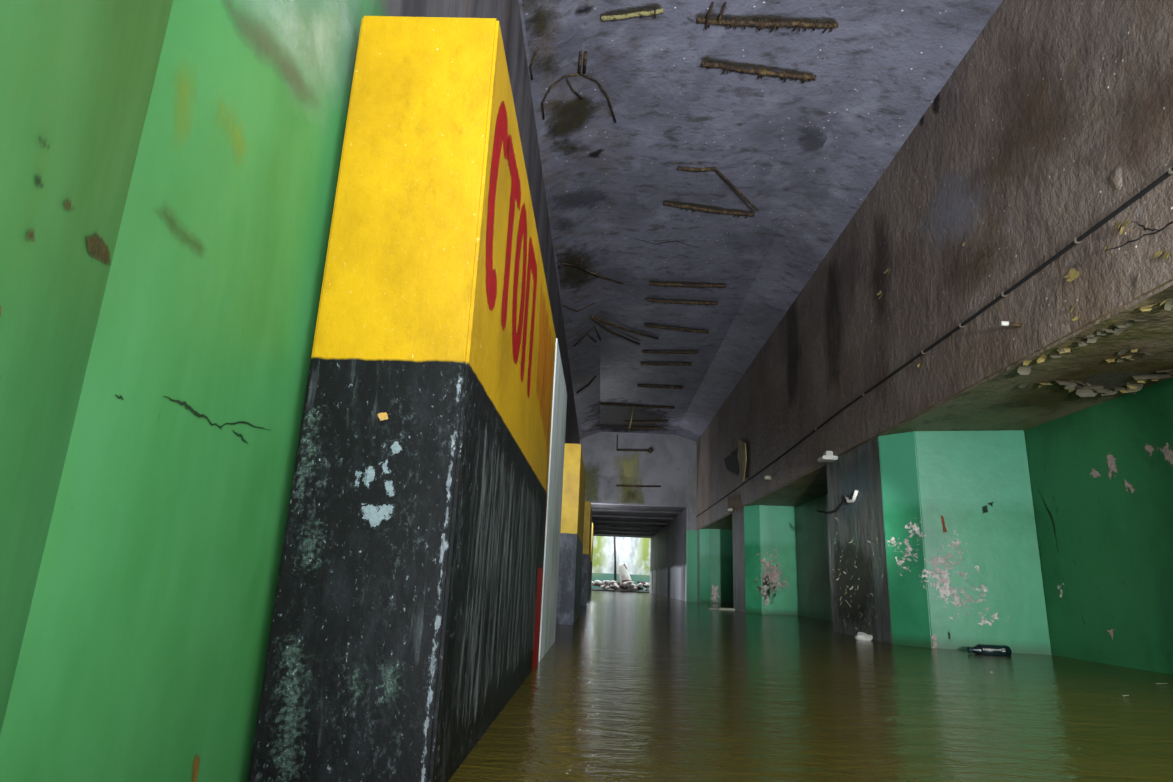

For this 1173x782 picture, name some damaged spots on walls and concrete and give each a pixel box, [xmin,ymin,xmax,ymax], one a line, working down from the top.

crack [1102,221,1173,254]
peeling [1064,268,1080,282]
peeling [1013,300,1173,407]
crack [163,396,269,444]
peeling [354,441,404,528]
peeling [1090,454,1135,493]
peeling [1145,443,1173,466]
peeling [749,547,792,605]
peeling [832,518,1010,648]